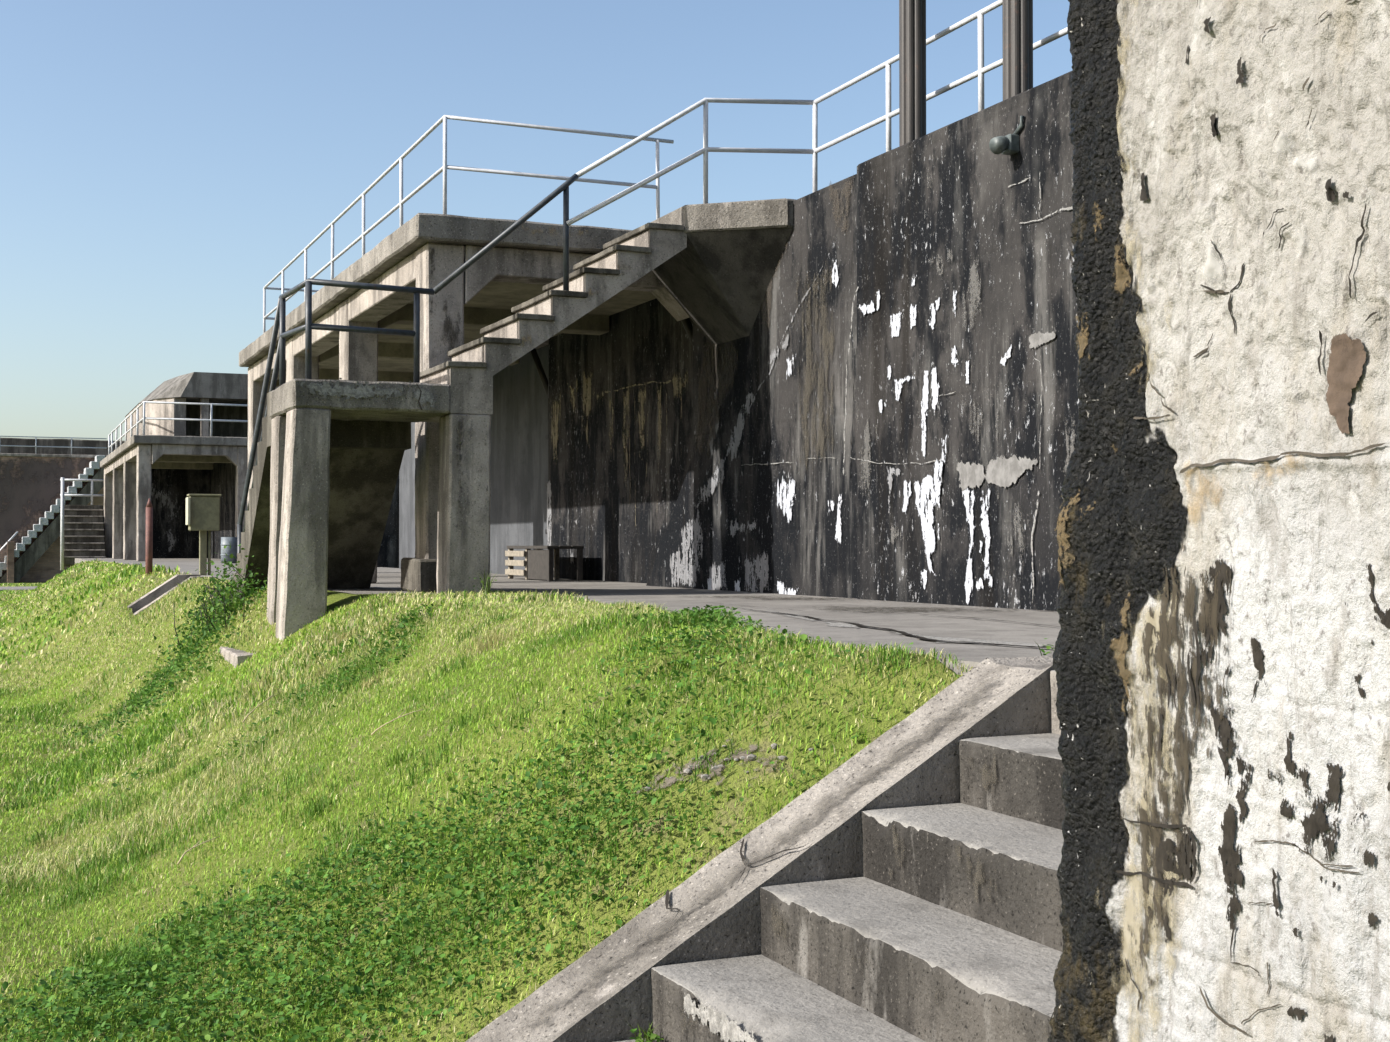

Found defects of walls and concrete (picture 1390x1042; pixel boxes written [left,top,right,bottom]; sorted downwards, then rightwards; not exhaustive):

water stain [0,456,90,548]
crack [710,359,1061,648]
peeling [859,291,957,338]
spalling [879,345,1037,604]
spalling [1029,331,1055,349]
water stain [716,0,1375,1042]
crack [1193,240,1244,357]
crack [1133,375,1386,473]
peeling [1326,333,1366,434]
crack [1348,204,1378,322]
water stain [1366,564,1390,645]
water stain [1368,912,1378,929]